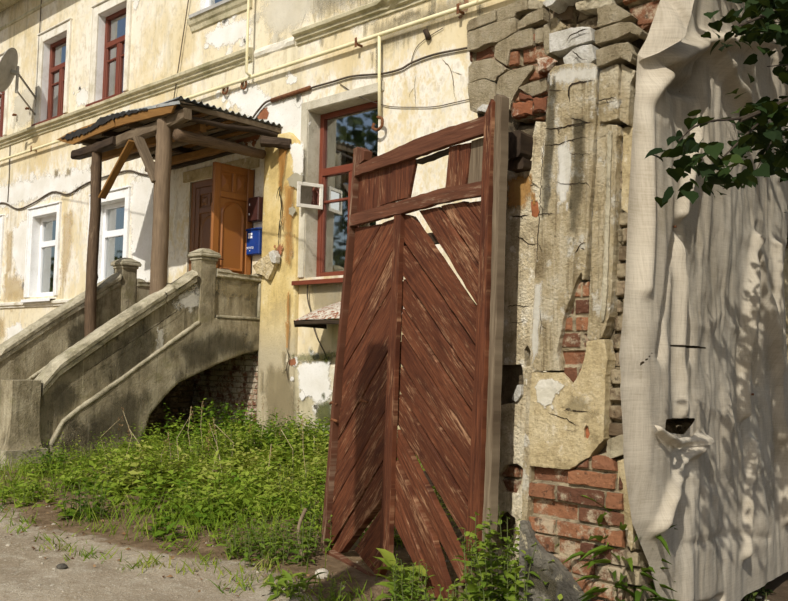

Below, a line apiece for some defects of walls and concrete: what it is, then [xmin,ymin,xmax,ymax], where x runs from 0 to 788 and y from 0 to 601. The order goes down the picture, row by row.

peeling [204,14,253,55]
crack [566,29,586,61]
corrosion [507,174,535,208]
crack [512,80,593,263]
leakage [42,386,75,422]
leakage [69,323,84,348]
leakage [71,391,148,449]
leakage [105,325,164,381]
leakage [171,331,253,379]
peeling [289,350,332,415]
spalling [535,282,592,409]
spalling [529,451,630,601]